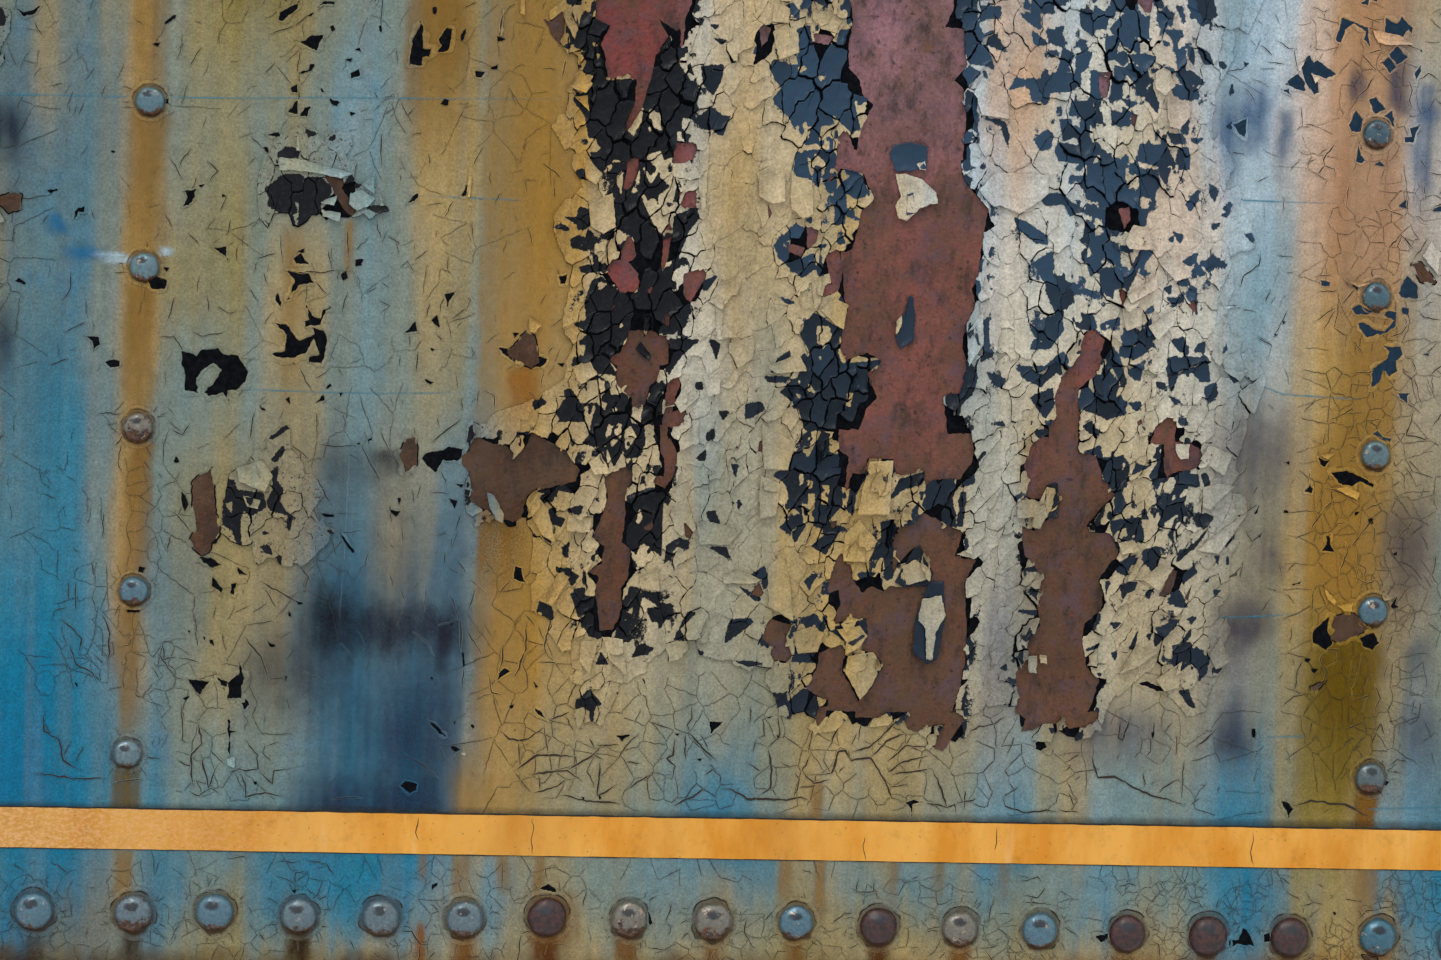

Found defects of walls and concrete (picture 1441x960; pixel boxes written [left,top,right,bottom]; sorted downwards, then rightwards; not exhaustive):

peeling [257,25,420,228]
peeling [1279,54,1339,99]
peeling [1335,0,1422,83]
peeling [178,341,253,404]
peeling [268,248,336,368]
peeling [394,0,1285,756]
crack [389,0,1441,820]
peeling [1319,242,1441,405]
peeling [179,425,354,598]
peeling [1305,590,1382,697]
rust [287,938,309,960]
crack [0,823,1441,960]